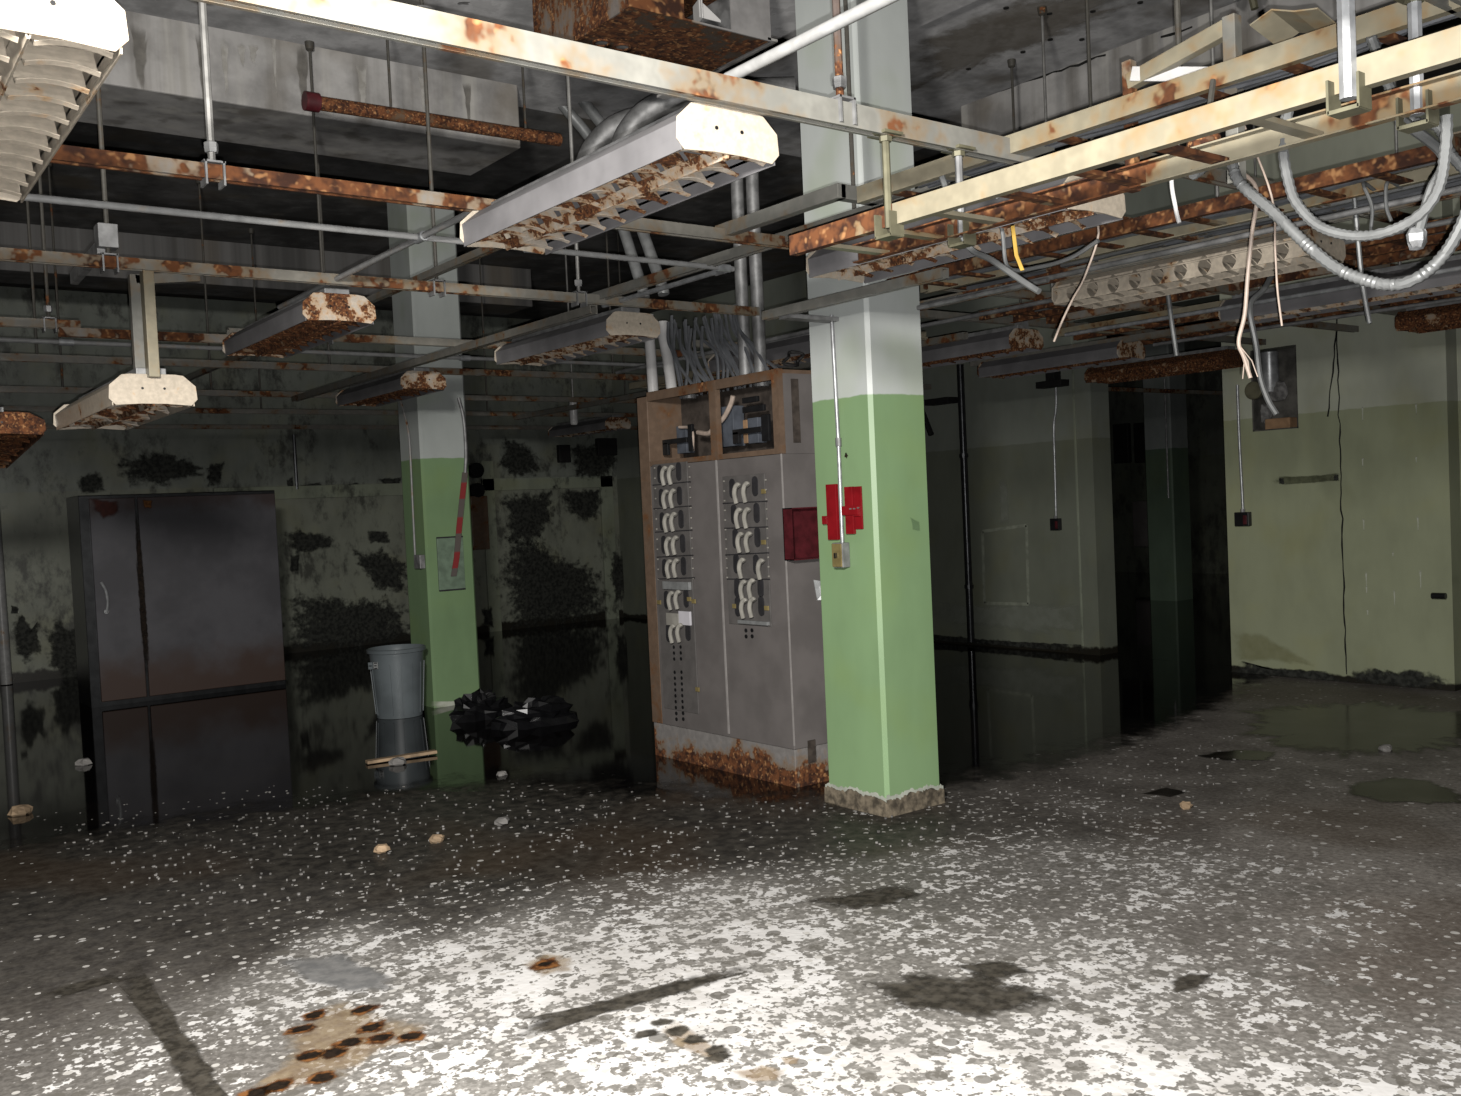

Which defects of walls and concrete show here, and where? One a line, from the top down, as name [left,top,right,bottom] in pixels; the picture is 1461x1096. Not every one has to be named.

damp [79,474,104,493]
damp [118,453,224,486]
damp [499,439,624,628]
damp [283,530,410,649]
damp [11,606,78,678]
damp [874,962,1053,1016]
rust [237,1005,426,1096]